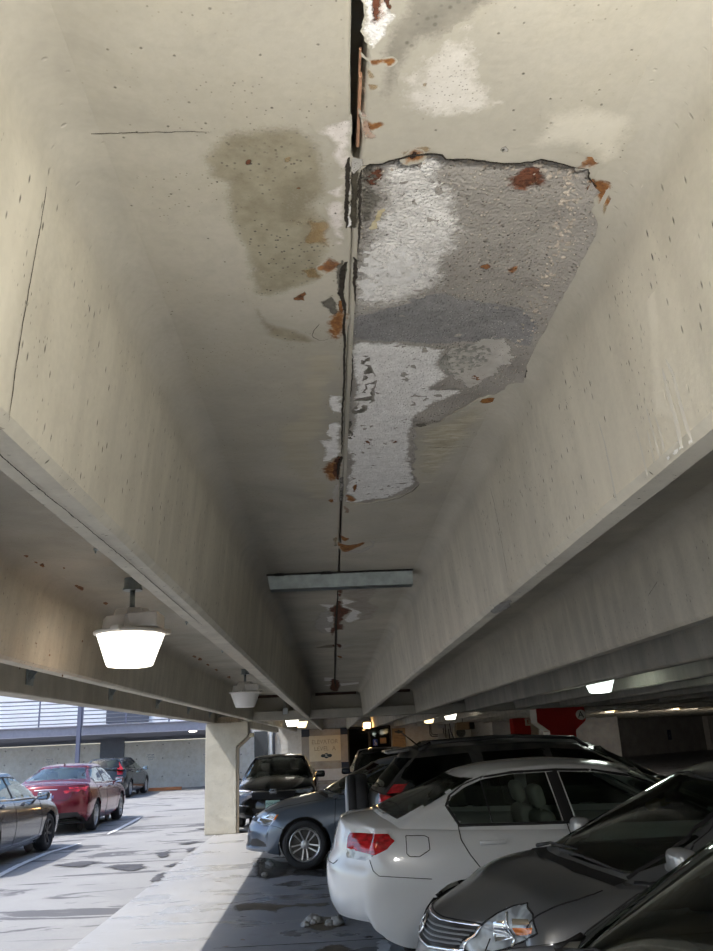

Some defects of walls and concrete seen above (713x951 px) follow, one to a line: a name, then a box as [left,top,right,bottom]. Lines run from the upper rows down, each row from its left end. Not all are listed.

leakage [360,0,508,122]
rust [358,108,385,138]
rust [505,164,549,193]
rust [574,156,613,208]
crack [337,257,358,477]
leakage [195,114,541,503]
spalling [346,155,601,503]
crack [330,590,339,687]